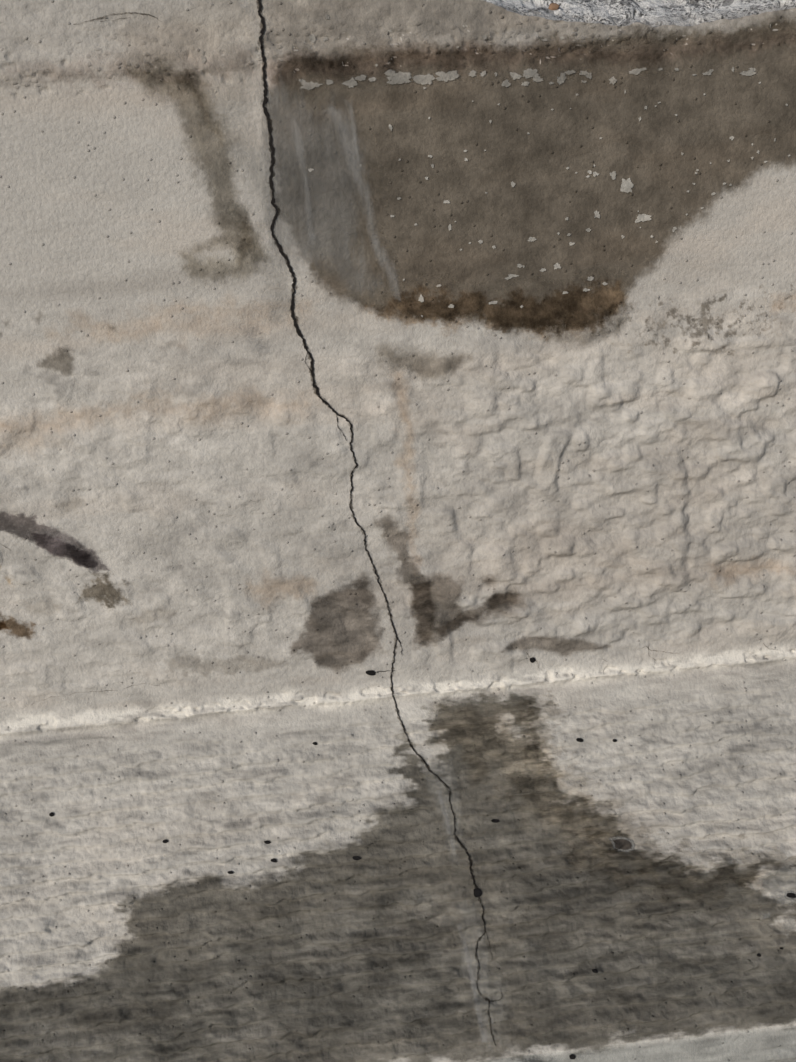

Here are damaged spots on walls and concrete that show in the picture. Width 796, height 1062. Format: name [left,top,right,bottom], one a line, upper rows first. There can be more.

damp [274,21,796,330]
crack [257,0,503,1046]
damp [316,657,338,665]
damp [433,724,494,764]
damp [398,766,435,798]
damp [521,858,741,914]
damp [42,986,188,1060]
damp [513,1003,581,1049]